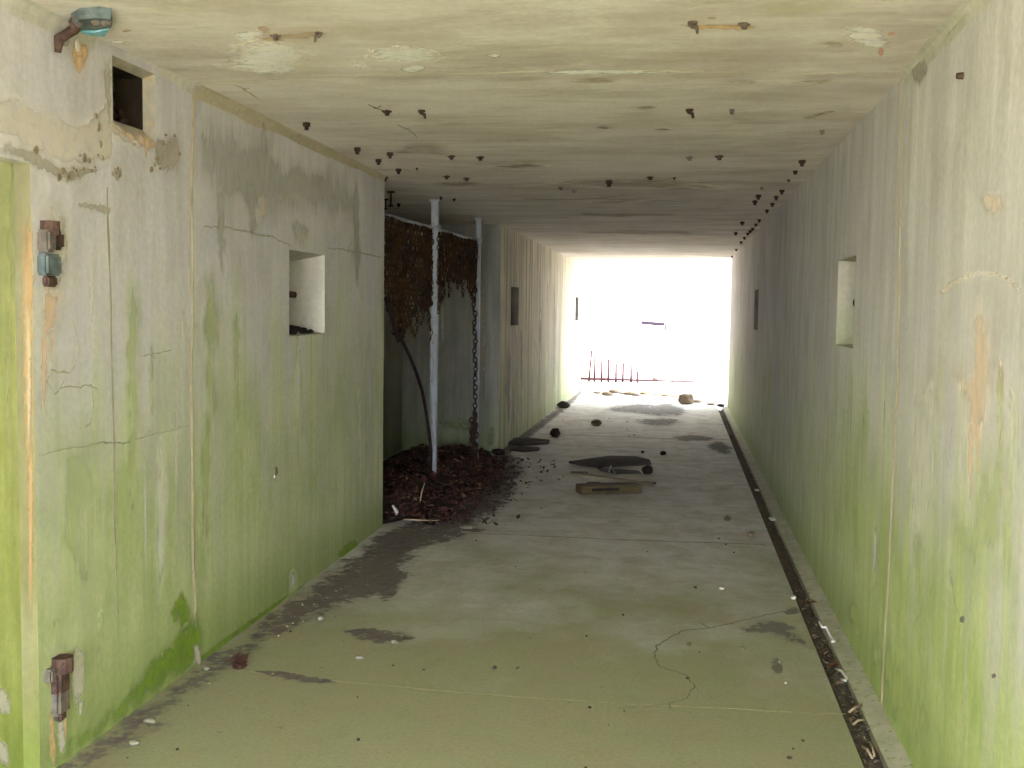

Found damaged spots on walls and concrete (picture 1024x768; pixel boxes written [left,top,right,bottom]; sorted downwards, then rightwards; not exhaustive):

rust [73,39,87,73]
peeling [0,106,131,182]
spalling [149,134,181,172]
crack [204,224,291,246]
crack [38,317,191,456]
leakage [144,423,177,570]
leakage [742,607,805,644]
leakage [72,649,83,714]
crack [619,612,780,711]